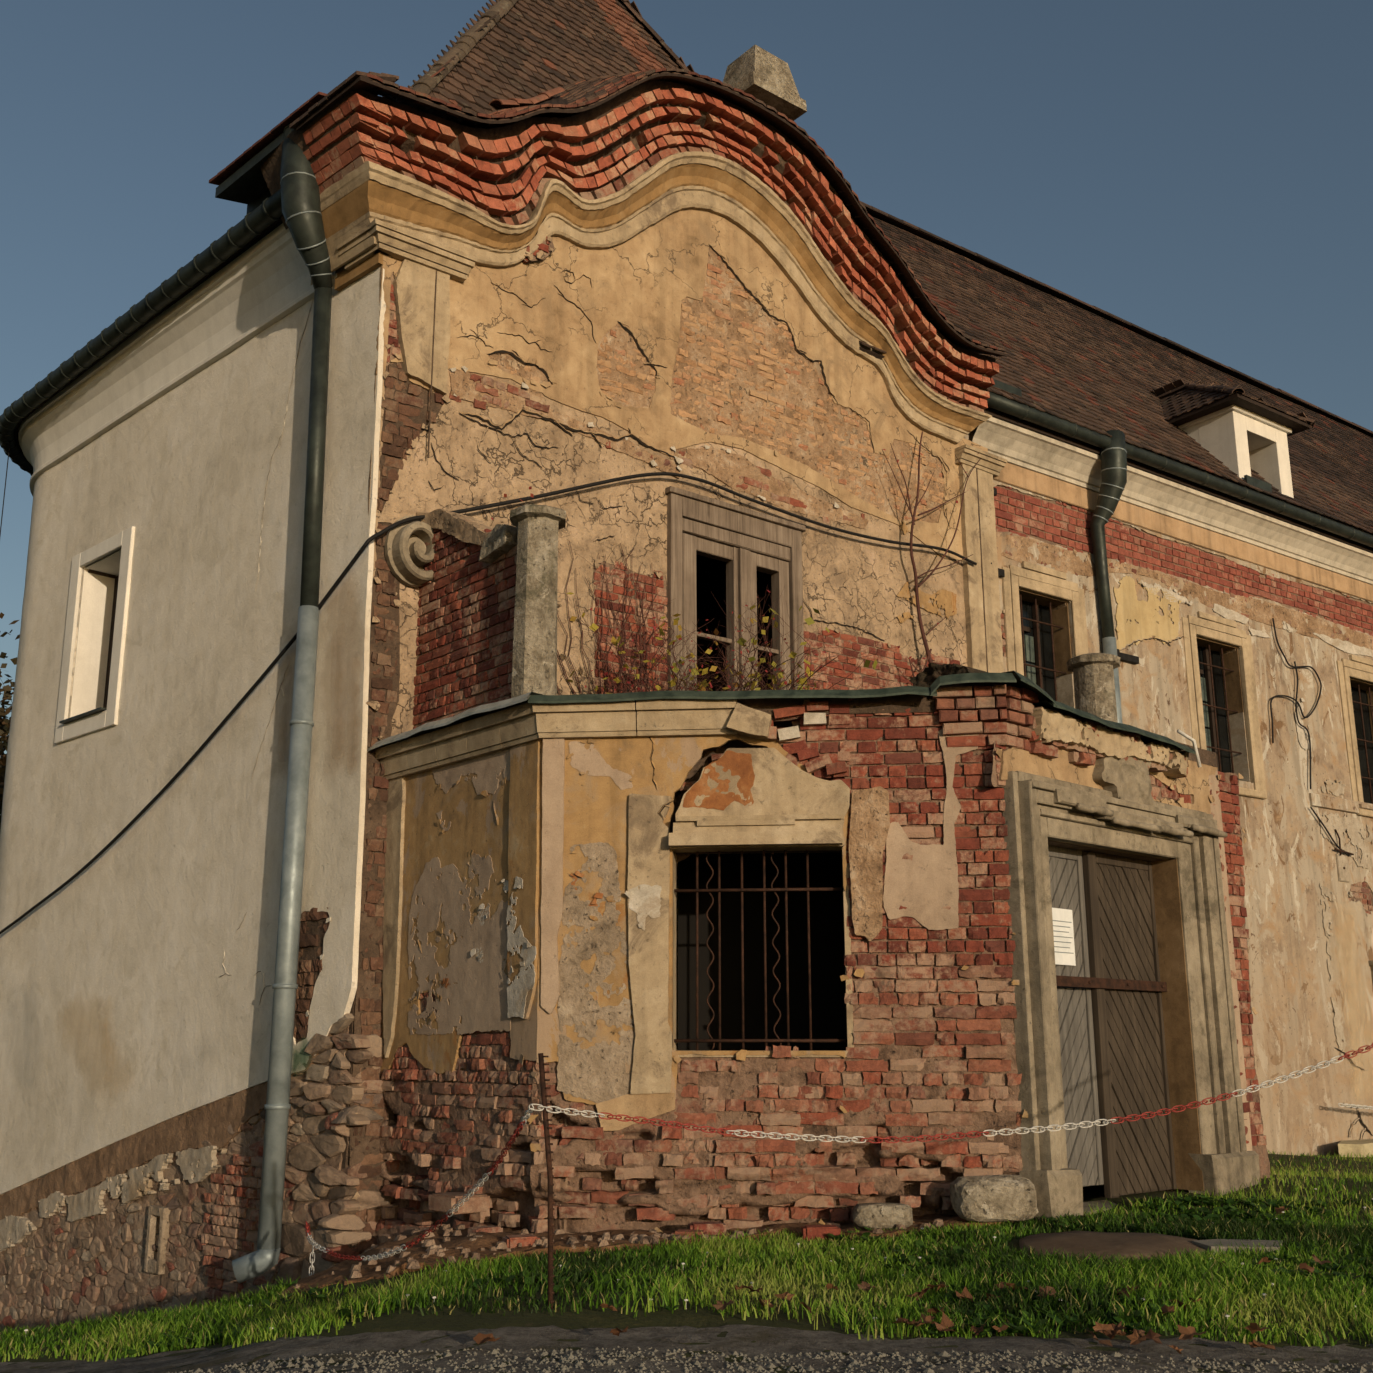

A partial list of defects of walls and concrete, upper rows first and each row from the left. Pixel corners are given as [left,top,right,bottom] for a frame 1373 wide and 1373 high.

spalling [348,246,1028,1252]